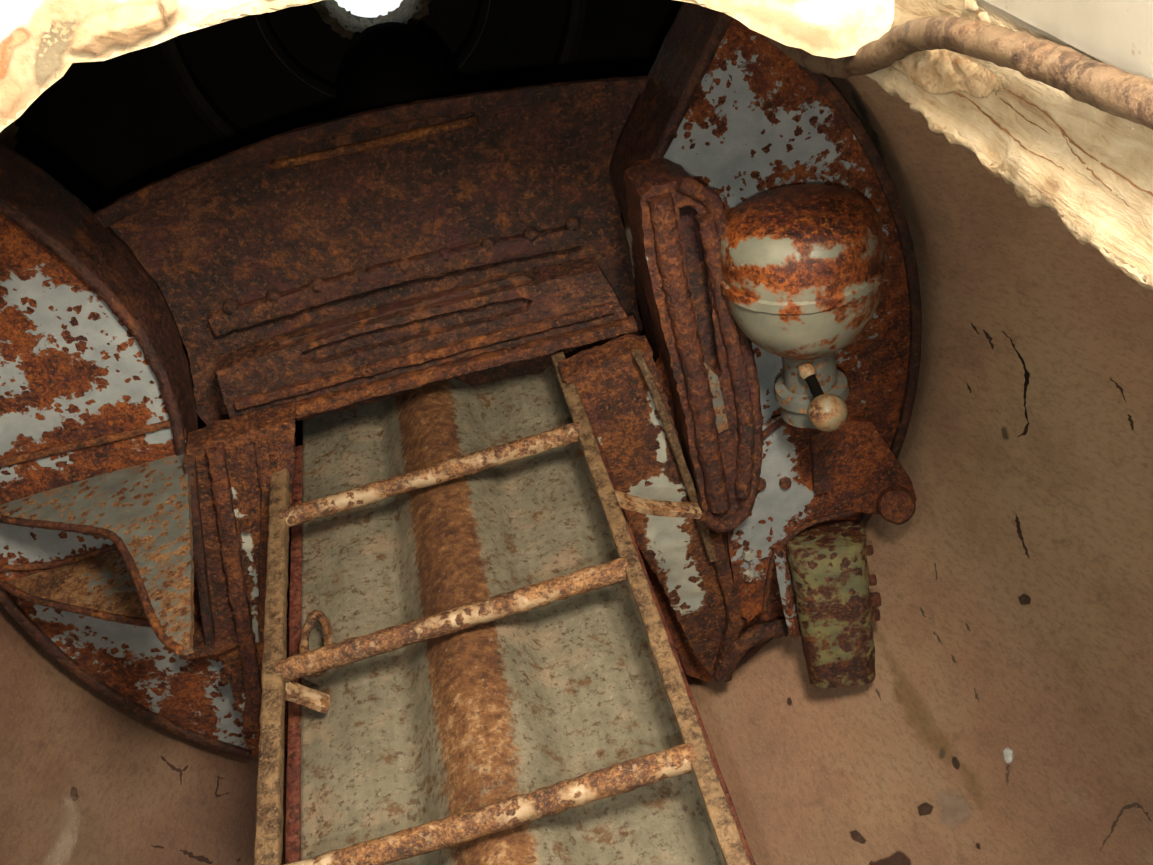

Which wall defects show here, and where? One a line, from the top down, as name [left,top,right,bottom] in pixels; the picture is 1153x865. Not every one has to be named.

spalling [35,22,79,86]
flaking render [0,120,19,150]
flaking render [886,49,1153,286]
crack [971,323,1030,437]
crack [1110,377,1134,430]
crack [1015,513,1029,558]
crack [1100,802,1151,852]